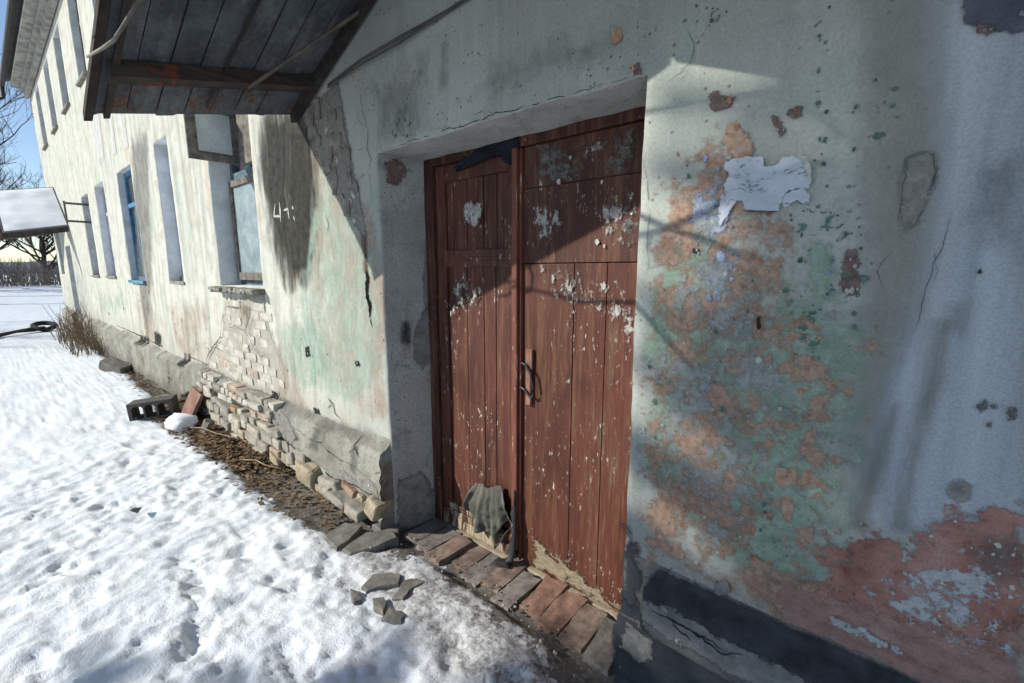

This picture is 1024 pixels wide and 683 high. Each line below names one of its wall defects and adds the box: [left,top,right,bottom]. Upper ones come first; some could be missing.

flaking render [174,83,383,426]
damp [267,125,311,268]
crack [364,241,372,325]
crack [914,218,951,331]
peeling [532,121,1024,683]
crack [653,568,740,656]